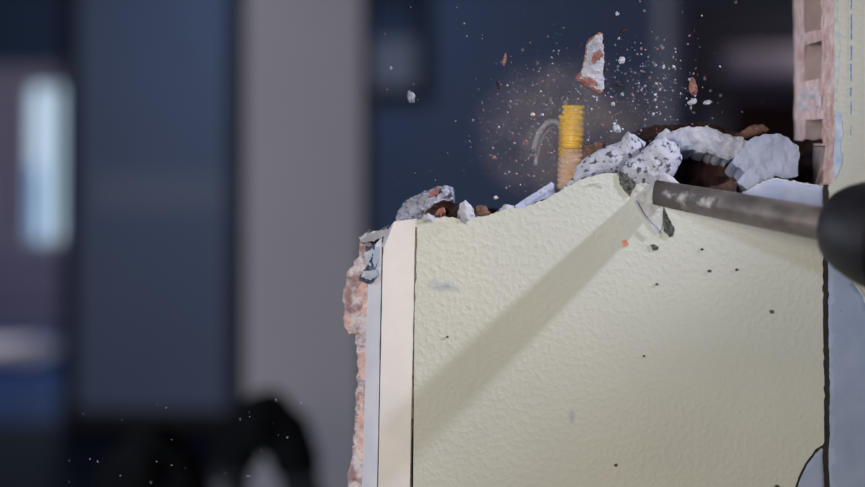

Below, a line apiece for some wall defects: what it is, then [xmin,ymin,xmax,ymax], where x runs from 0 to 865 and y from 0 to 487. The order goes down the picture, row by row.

spalling [617,171,674,237]
peeling [745,179,823,206]
crack [822,185,830,205]
crack [817,257,830,487]